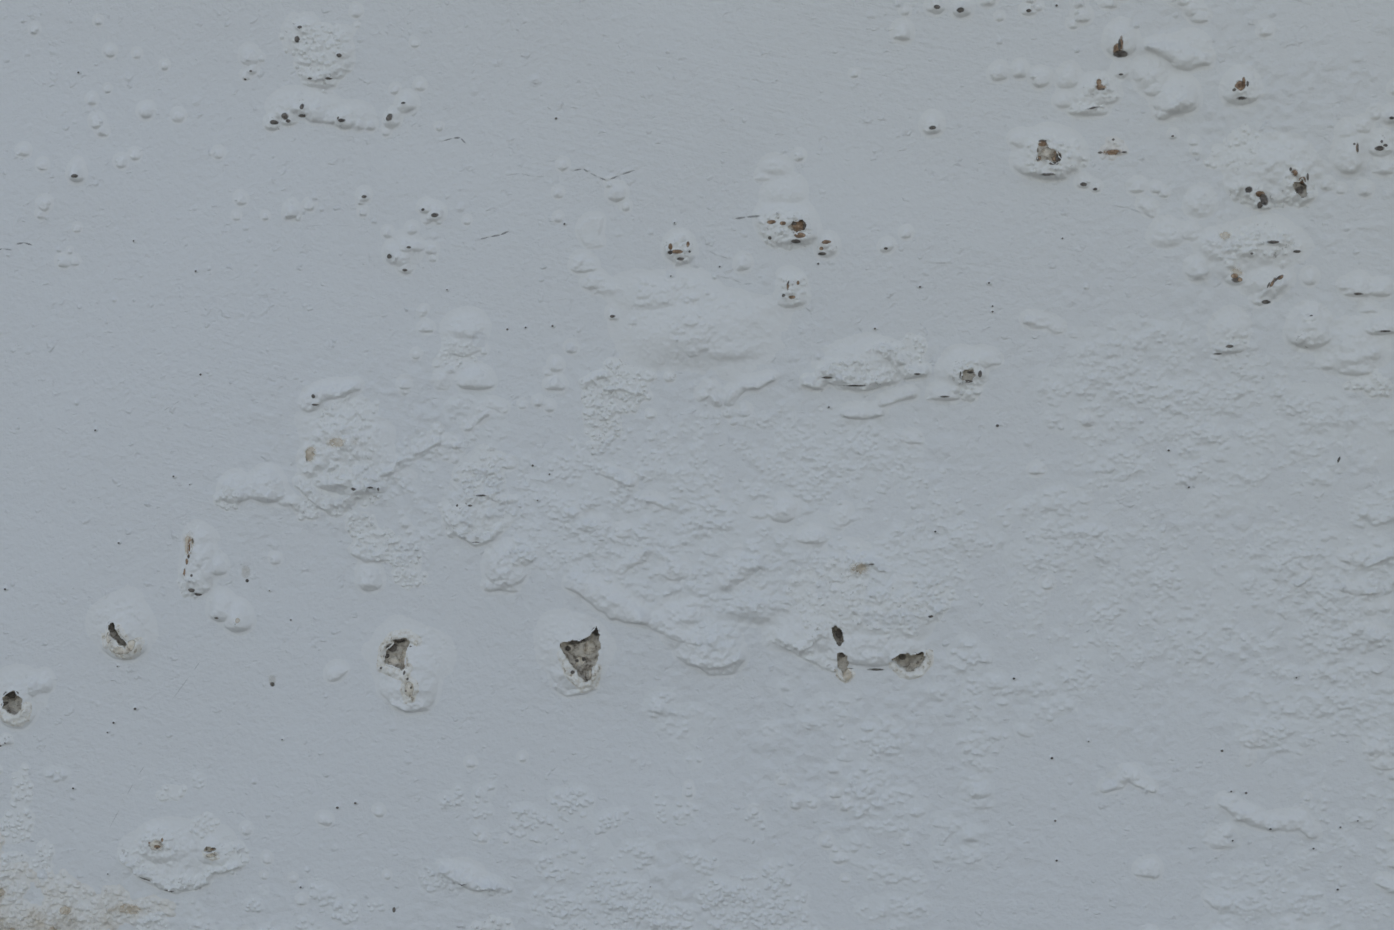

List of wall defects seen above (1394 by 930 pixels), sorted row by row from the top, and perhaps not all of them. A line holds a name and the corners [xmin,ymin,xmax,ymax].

peeling [760,534,956,684]